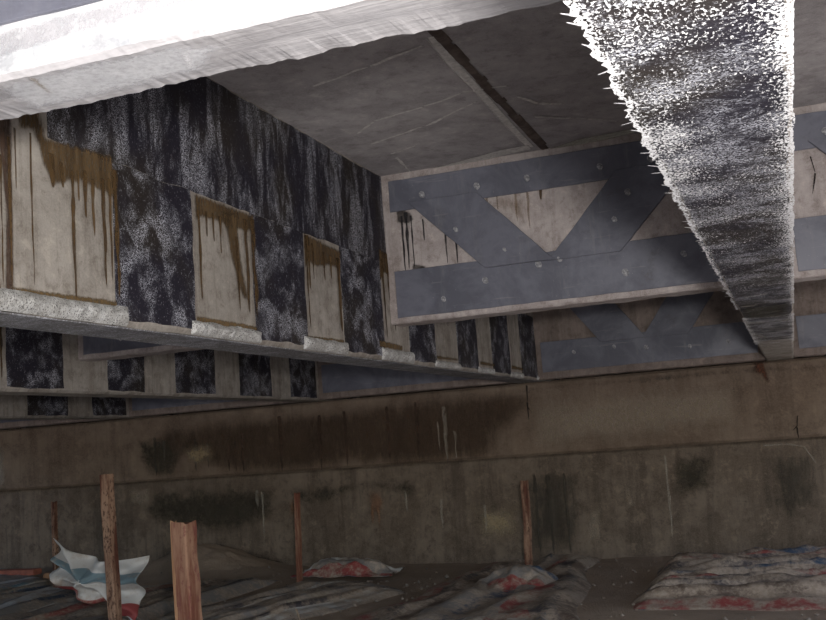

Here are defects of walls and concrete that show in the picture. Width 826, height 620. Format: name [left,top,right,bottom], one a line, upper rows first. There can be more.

rust [0,113,121,306]
rust [195,195,259,317]
rust [197,317,257,331]
rust [304,233,344,343]
leakage [154,397,517,474]